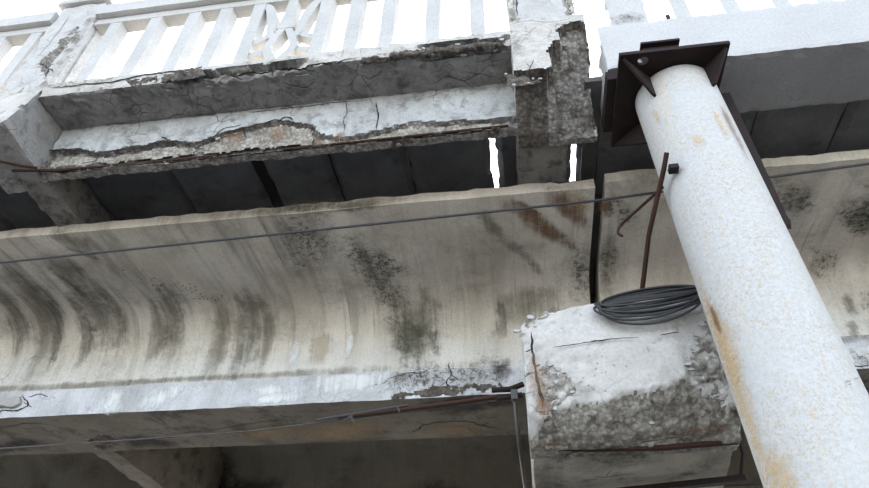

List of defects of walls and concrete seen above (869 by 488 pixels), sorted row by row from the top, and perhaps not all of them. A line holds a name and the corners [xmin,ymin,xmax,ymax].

peeling [37,26,80,79]
spalling [126,66,206,87]
crack [39,15,355,164]
spalling [0,123,509,173]
corrosion [513,202,564,243]
corrosion [552,194,586,225]
leakage [0,292,26,341]
leakage [57,262,112,354]
leakage [236,297,263,360]
leakage [348,237,427,354]
spalling [535,321,739,455]
crack [411,421,501,433]